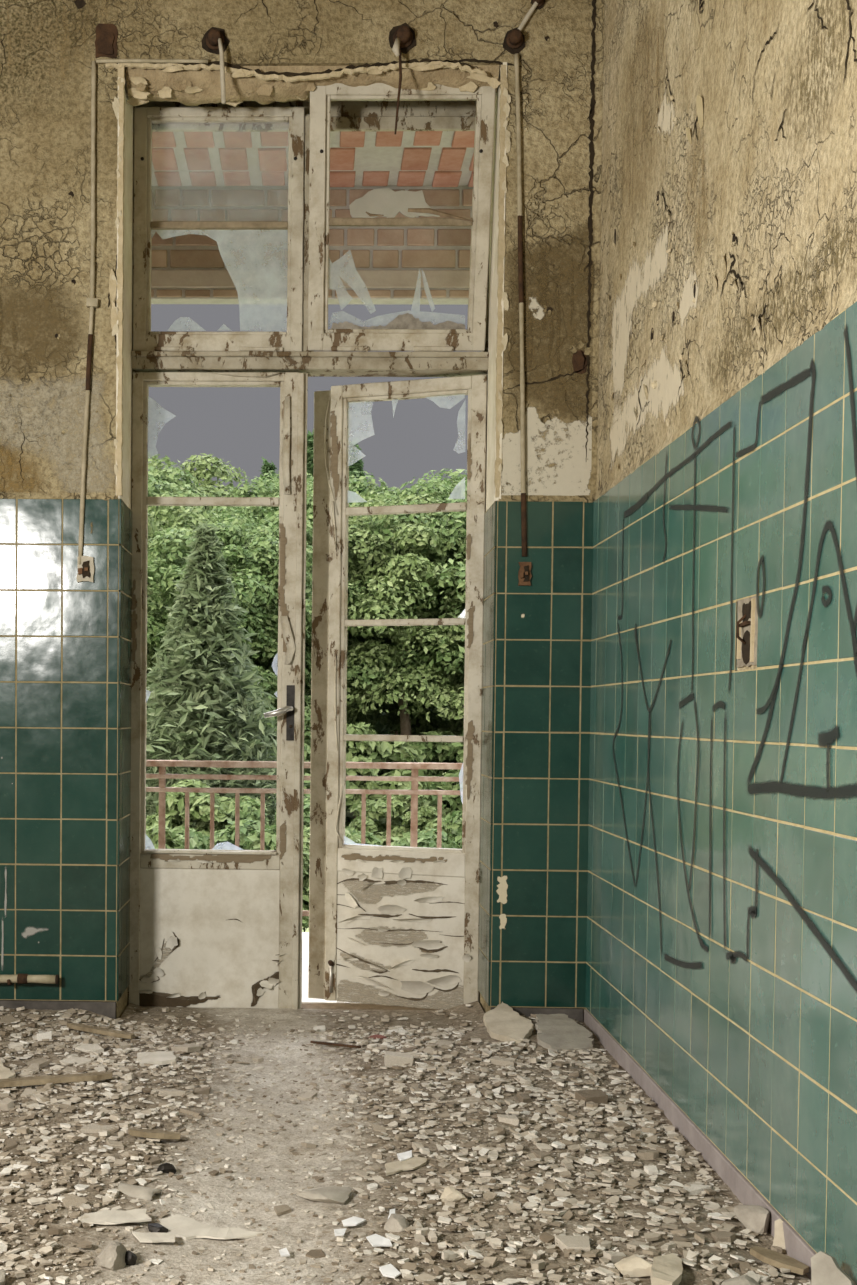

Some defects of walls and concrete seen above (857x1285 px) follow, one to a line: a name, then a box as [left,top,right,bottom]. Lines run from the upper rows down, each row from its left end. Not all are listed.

crack [752,0,857,141]
leakage [0,288,76,376]
spalling [0,65,592,498]
crack [503,0,597,457]
peeling [608,226,701,470]
crack [711,236,771,339]
leakage [22,927,48,943]
peeling [128,932,221,1007]
peeling [251,954,287,1007]
peeling [325,853,471,1010]